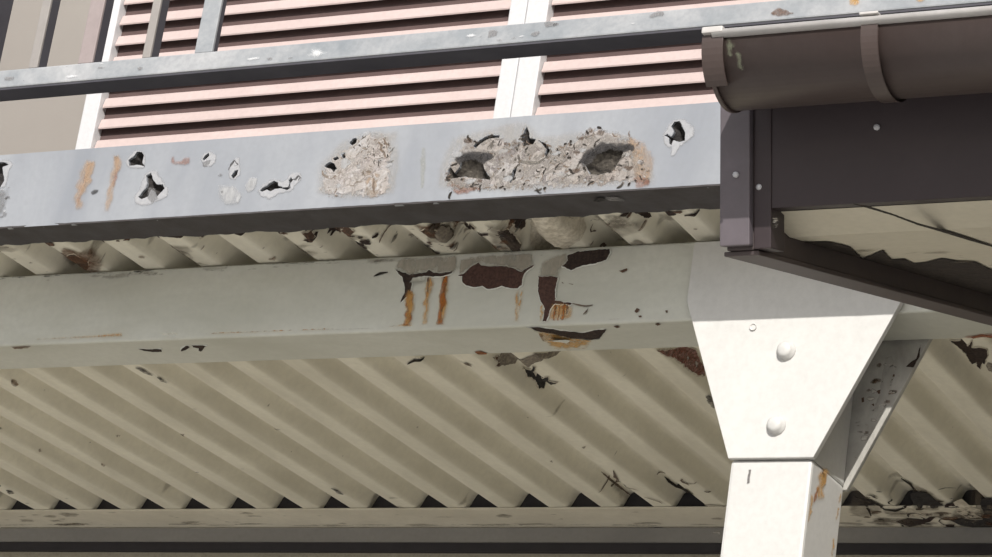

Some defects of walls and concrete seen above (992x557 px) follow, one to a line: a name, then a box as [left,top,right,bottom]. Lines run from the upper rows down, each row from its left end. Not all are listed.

rust [76,156,121,204]
spalling [130,152,165,199]
peeling [220,171,293,203]
spalling [320,132,394,198]
spalling [446,126,650,199]
peeling [394,219,619,368]
peeling [949,338,992,372]
rust [810,470,827,514]
spalling [857,478,992,527]